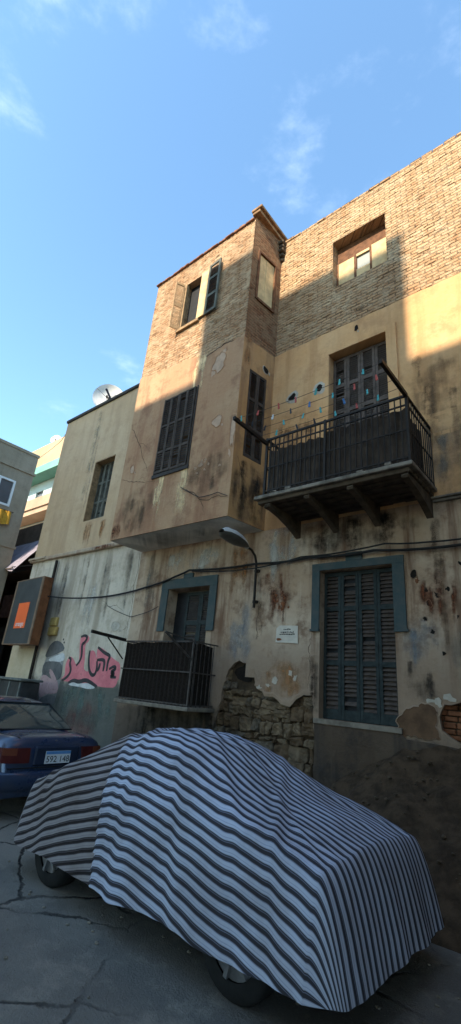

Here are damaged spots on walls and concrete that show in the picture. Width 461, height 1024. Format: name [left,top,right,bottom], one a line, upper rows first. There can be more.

leakage [153,476,164,507]
leakage [176,469,187,508]
corrosion [265,574,289,614]
corrosion [420,577,457,614]
spalling [214,664,314,779]
spalling [395,694,461,741]